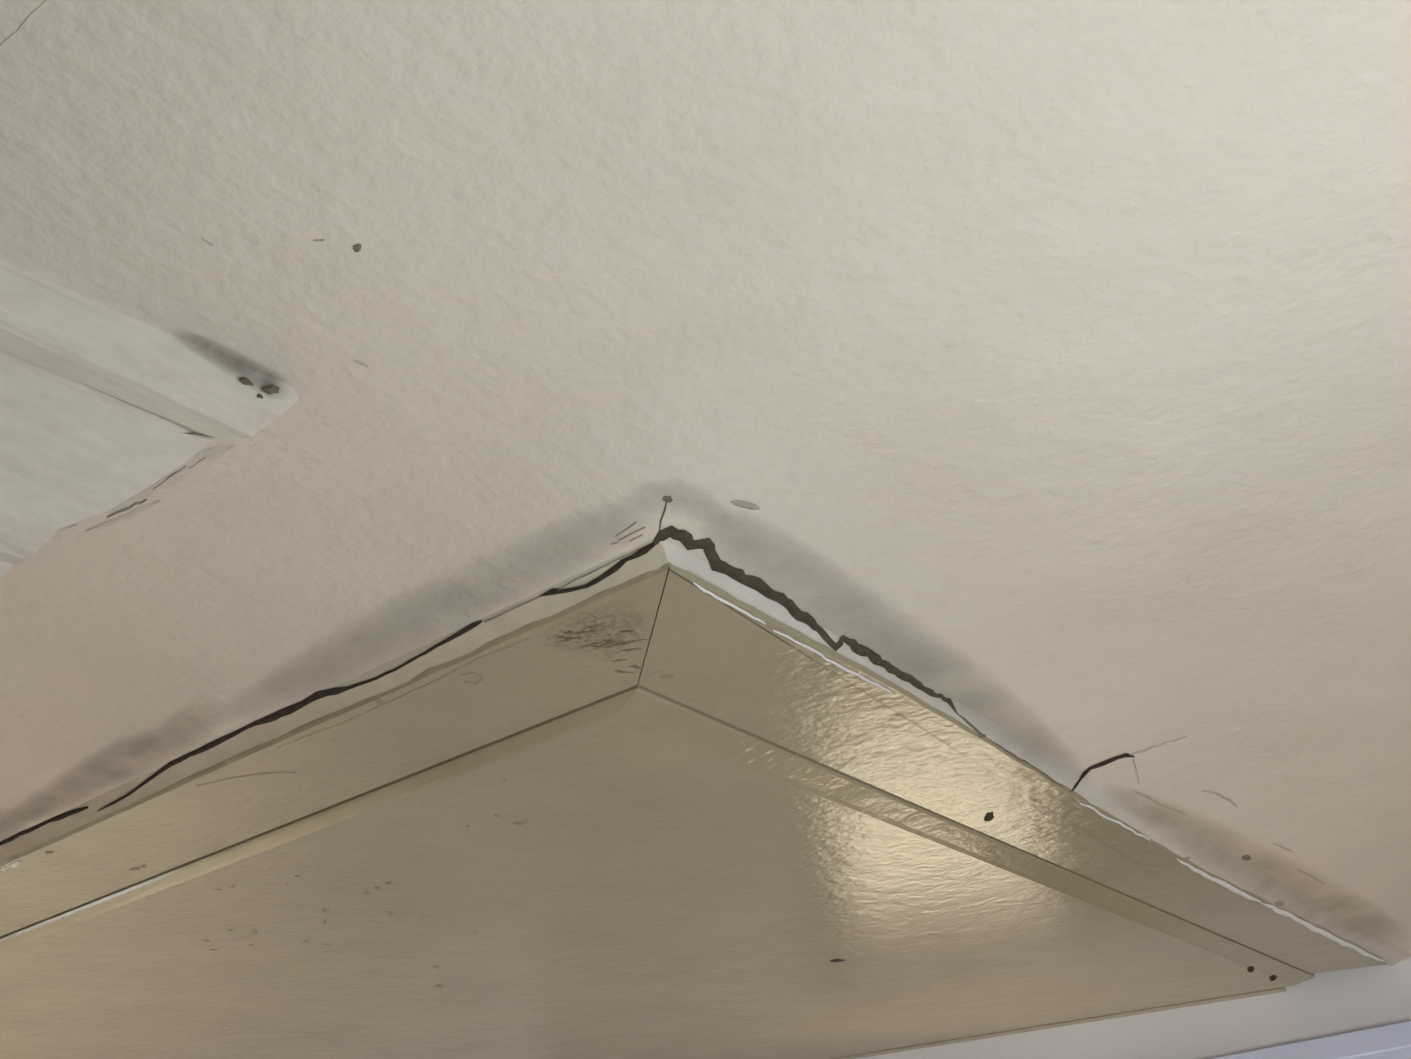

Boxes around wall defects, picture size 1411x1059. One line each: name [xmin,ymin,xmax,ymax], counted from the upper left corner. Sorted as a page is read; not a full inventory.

crack [0,496,1238,846]